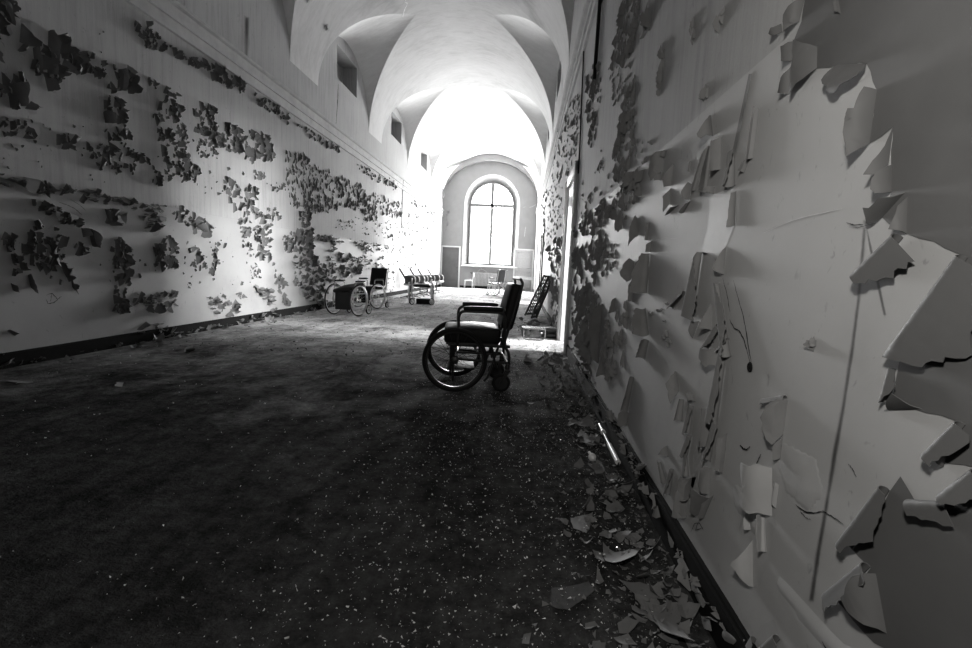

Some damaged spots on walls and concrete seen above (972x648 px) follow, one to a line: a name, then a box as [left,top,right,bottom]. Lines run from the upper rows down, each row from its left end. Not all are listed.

peeling [523,0,788,648]
peeling [768,0,972,648]